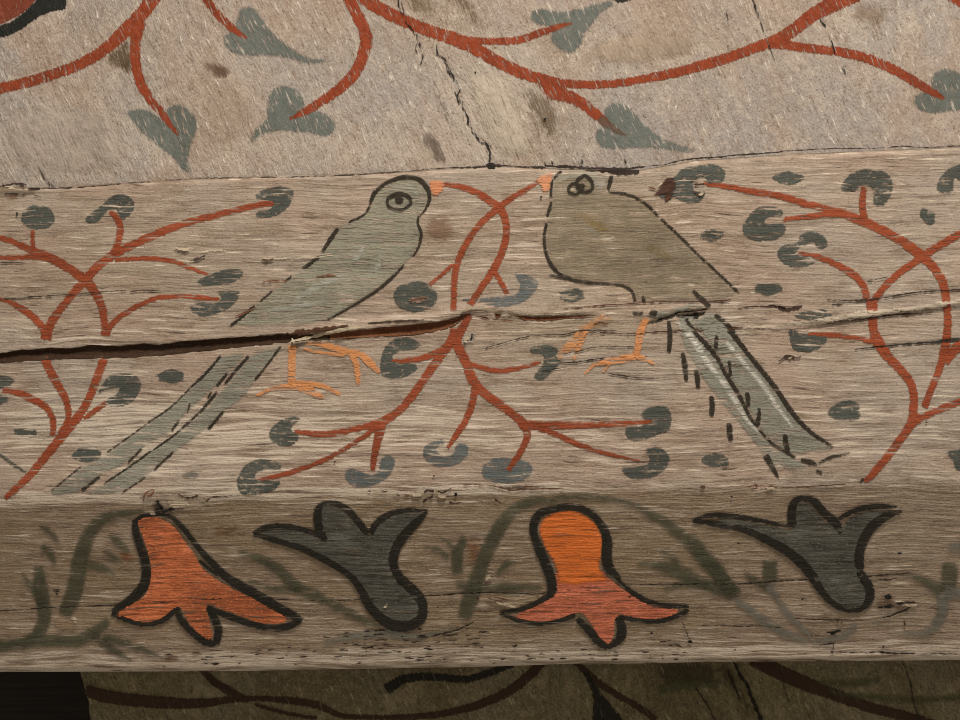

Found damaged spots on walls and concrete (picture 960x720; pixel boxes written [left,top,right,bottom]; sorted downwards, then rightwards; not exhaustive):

crack [398,0,492,163]
crack [3,290,159,299]
crack [826,289,960,324]
crack [479,299,753,379]
crack [855,338,960,350]